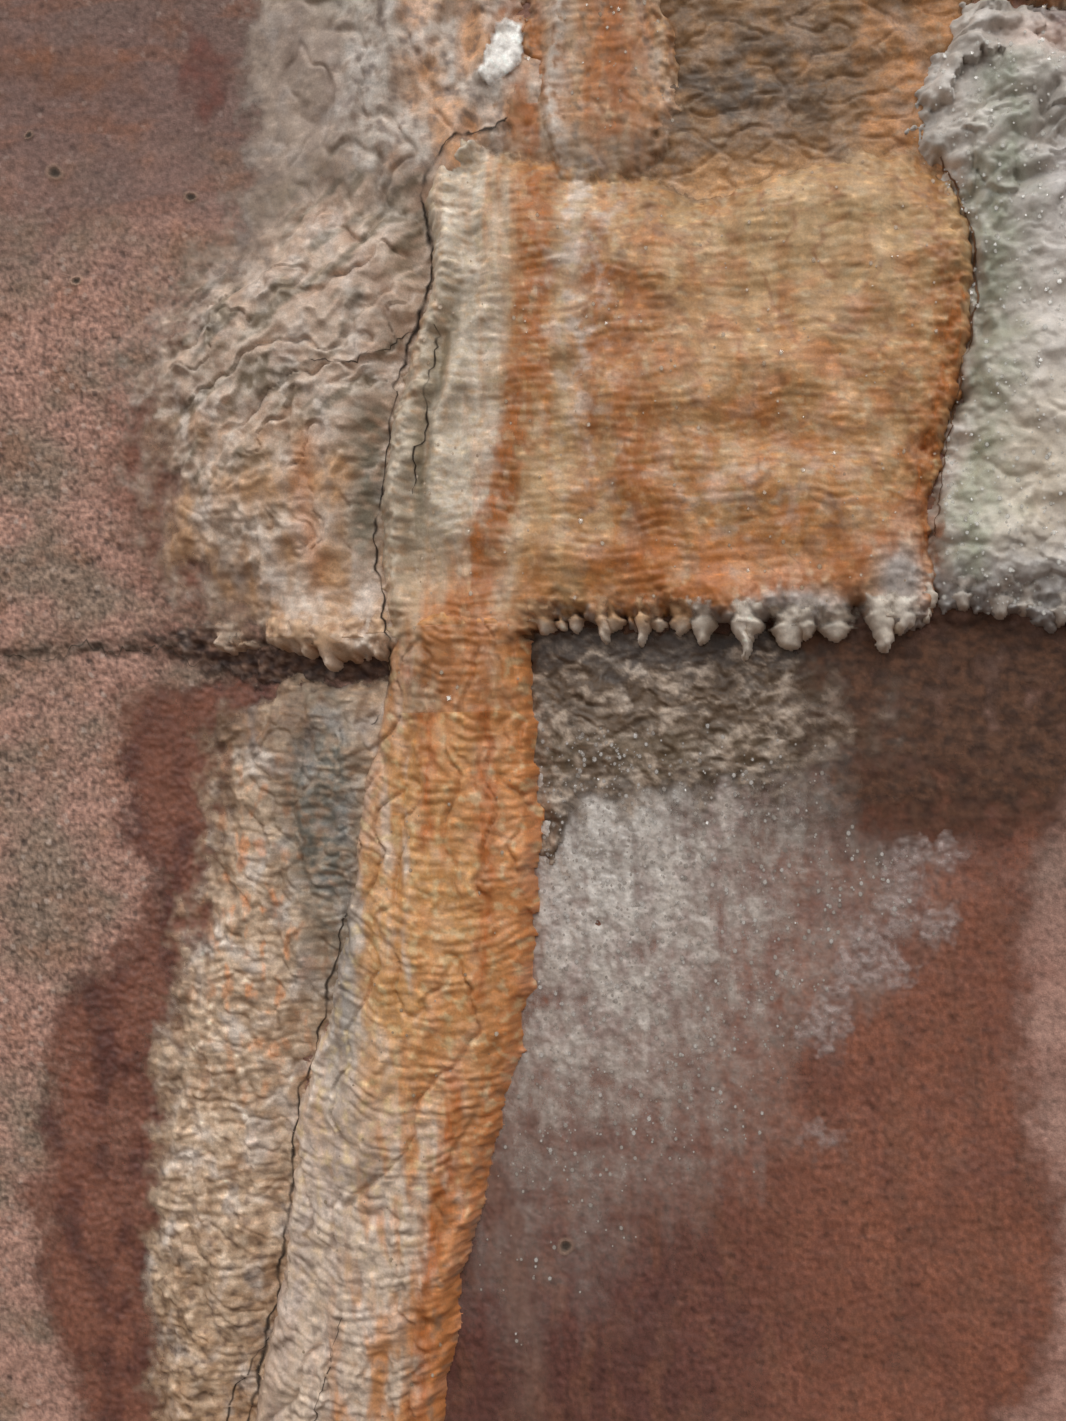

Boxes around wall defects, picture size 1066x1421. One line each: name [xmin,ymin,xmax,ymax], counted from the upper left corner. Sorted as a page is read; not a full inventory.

crack [311,116,508,725]
corrosion [454,313,541,623]
corrosion [914,292,966,497]
crack [2,639,209,667]
corrosion [478,709,494,875]
damp [21,676,278,1421]
crack [226,914,347,1421]
corrosion [419,1083,460,1354]
damp [444,591,1066,1421]